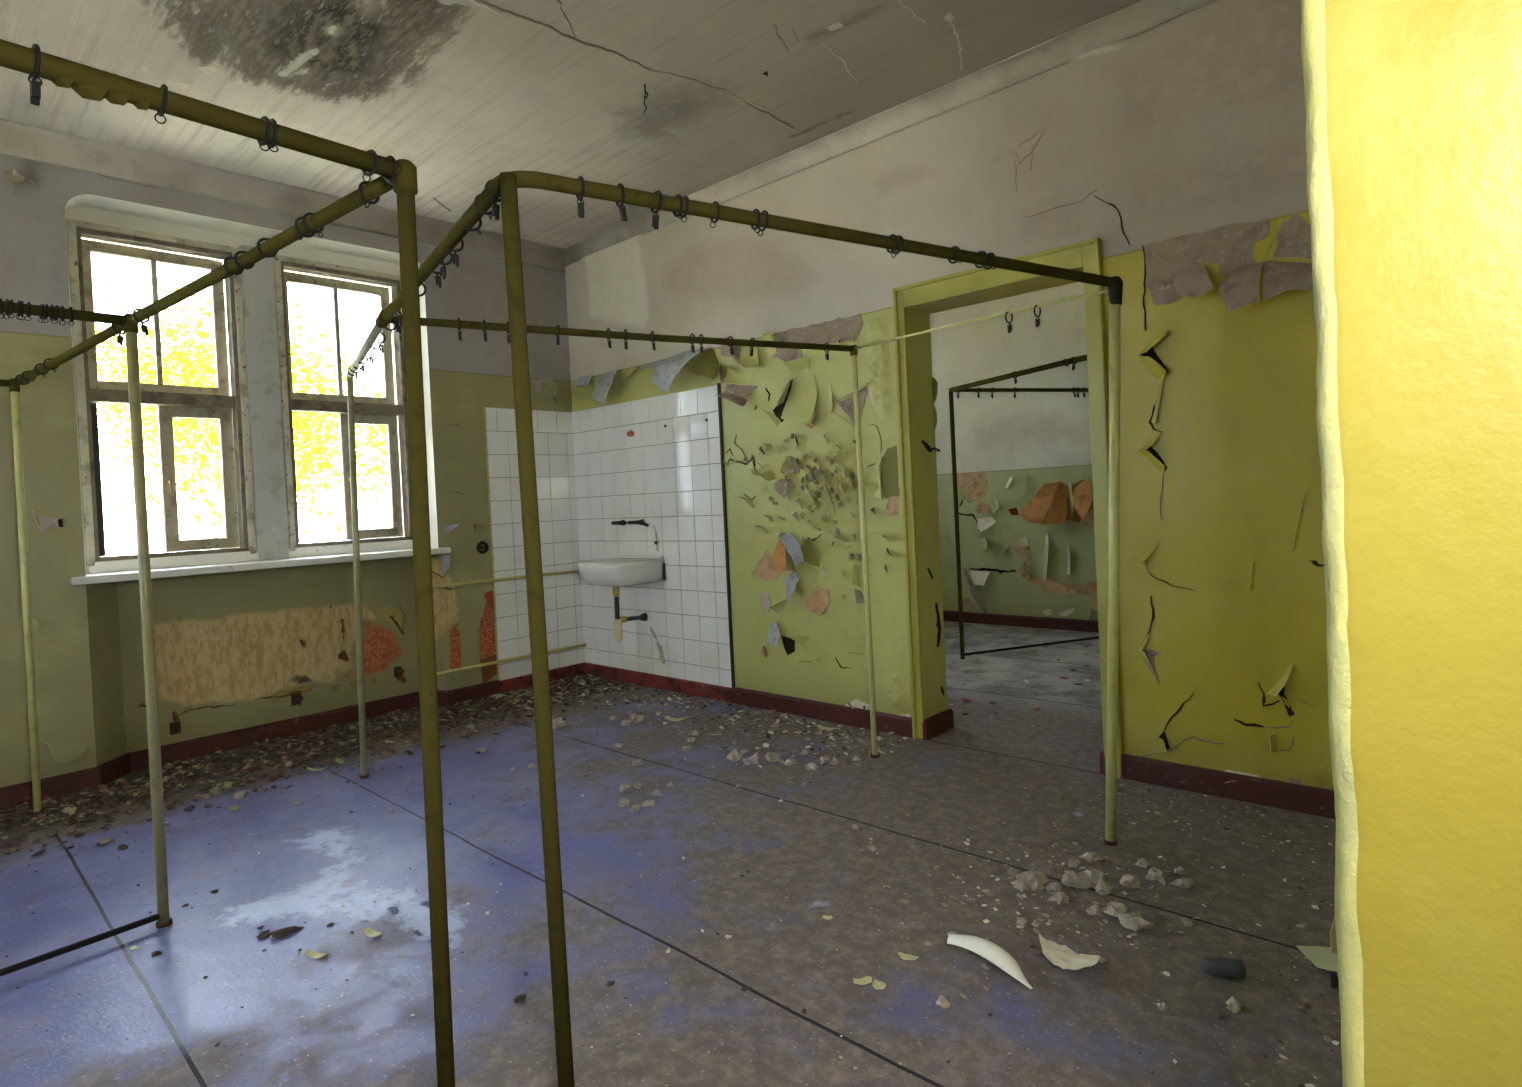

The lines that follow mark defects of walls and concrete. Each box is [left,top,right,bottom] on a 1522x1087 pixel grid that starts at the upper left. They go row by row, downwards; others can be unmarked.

water stain [127,0,490,110]
crack [469,0,860,128]
flaking render [1138,213,1313,383]
peeling [930,342,938,430]
crack [1149,393,1161,432]
flaking render [139,601,381,709]
flaking render [431,553,461,643]
peeling [574,314,899,668]
peeling [957,472,1098,620]
crack [1140,573,1194,645]
crack [1292,491,1325,567]
crack [1140,682,1316,757]